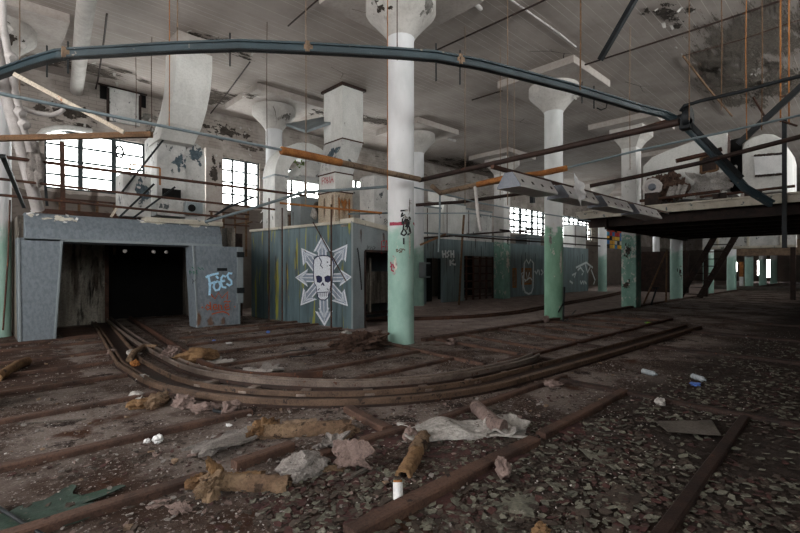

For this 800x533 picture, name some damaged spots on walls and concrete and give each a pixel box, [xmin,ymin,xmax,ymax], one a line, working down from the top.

spalling [371,0,393,20]
spalling [420,0,434,24]
peeling [641,0,800,109]
peeling [33,98,97,128]
peeling [202,121,264,156]